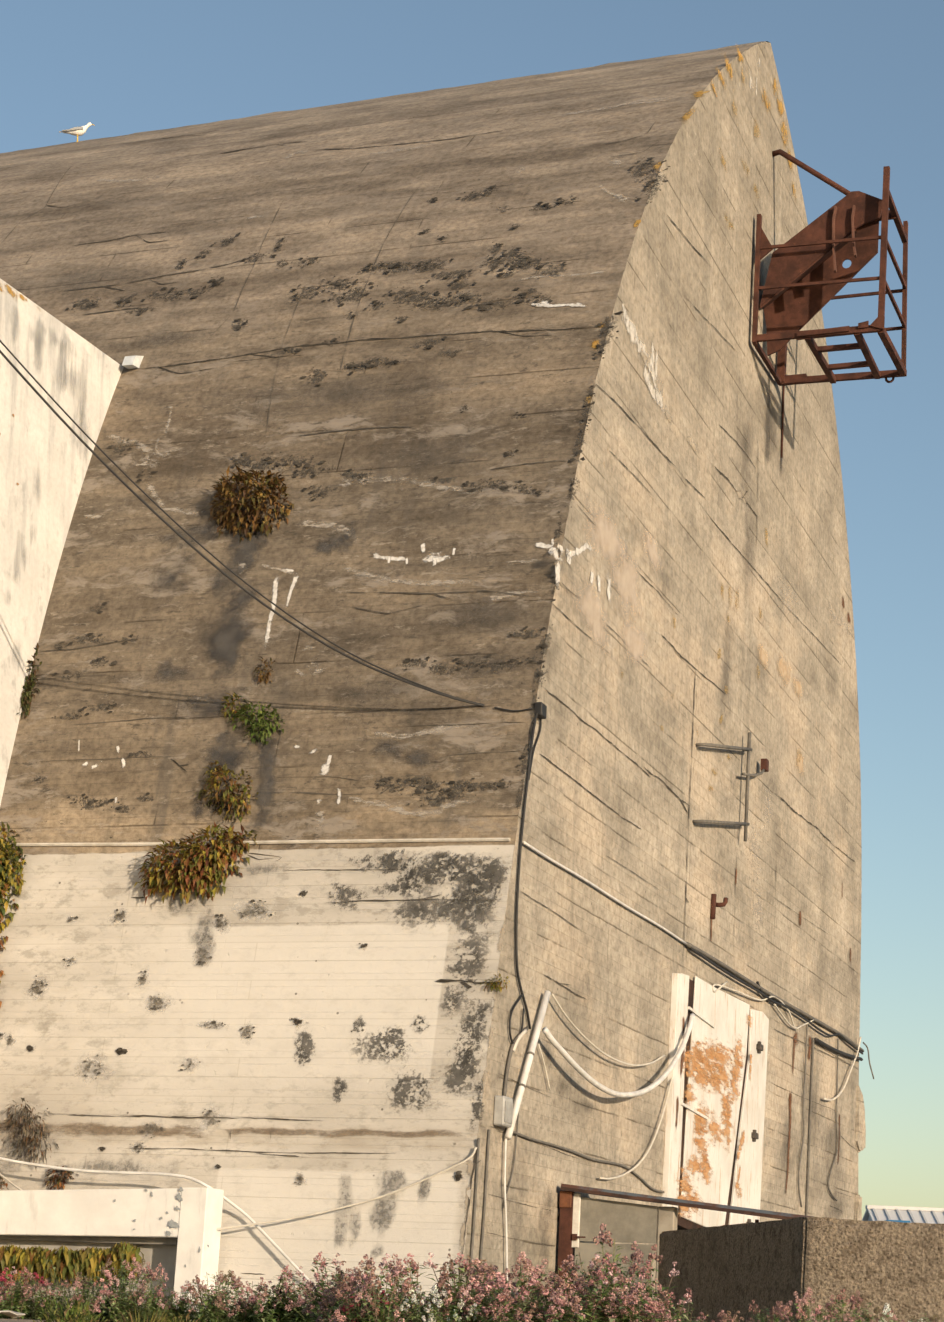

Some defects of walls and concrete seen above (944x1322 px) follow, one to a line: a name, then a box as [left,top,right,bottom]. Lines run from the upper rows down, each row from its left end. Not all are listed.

leakage [329,883,362,909]
leakage [196,919,213,964]
leakage [349,849,505,1127]
leakage [294,1031,314,1065]
leakage [333,1079,347,1103]
leakage [0,1122,196,1173]
leakage [230,1128,449,1137]
corrosion [675,1017,752,1217]